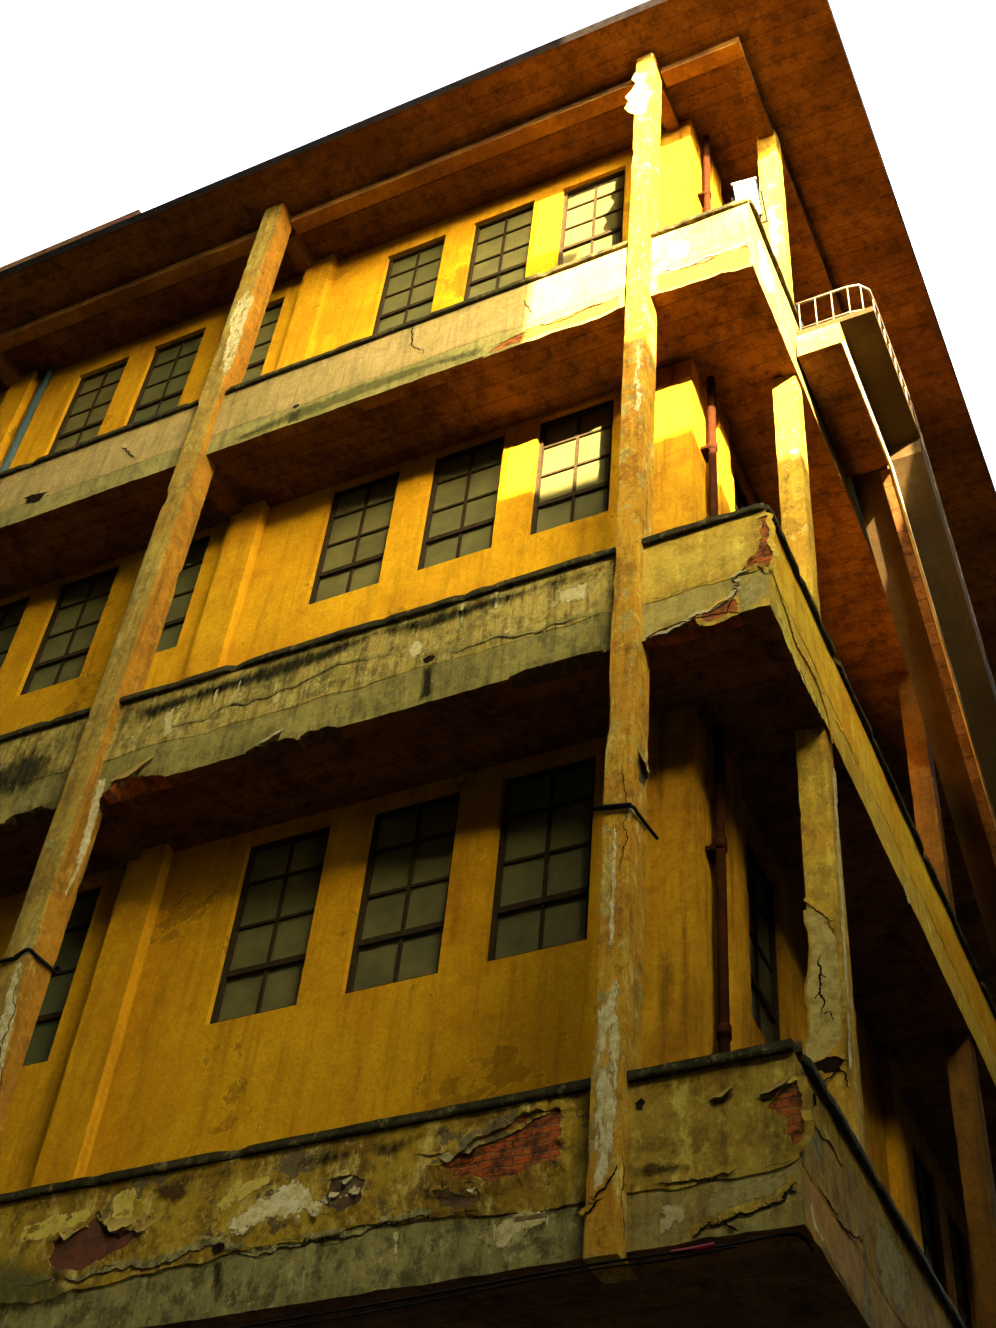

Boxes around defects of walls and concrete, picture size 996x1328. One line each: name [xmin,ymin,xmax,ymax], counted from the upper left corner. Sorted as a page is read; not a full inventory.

peeling [625,72,653,115]
flaking render [654,244,753,293]
crack [646,563,861,770]
spalling [245,726,344,764]
crack [803,896,840,1020]
peeling [592,979,620,1190]
flaking render [20,1188,152,1283]
crack [12,1206,451,1286]
peeling [185,1168,372,1241]
crack [412,1109,555,1168]
flaking render [425,1095,577,1220]
crack [579,1065,865,1243]